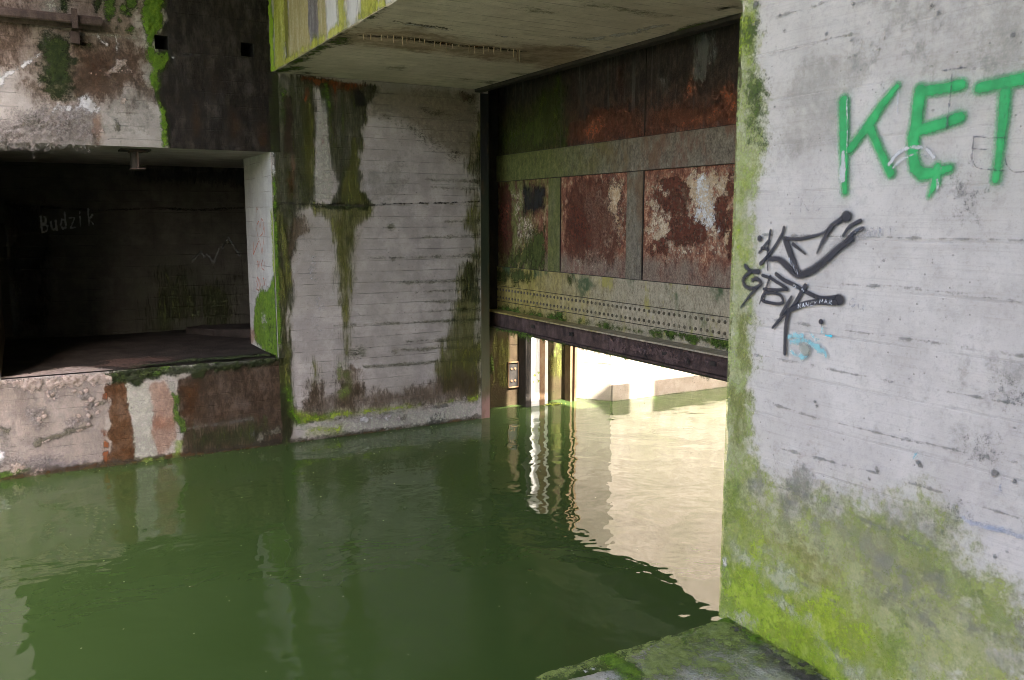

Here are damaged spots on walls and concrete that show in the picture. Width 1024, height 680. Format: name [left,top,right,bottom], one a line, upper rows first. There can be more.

water stain [43,95,101,114]
corrosion [645,68,739,135]
water stain [314,100,333,200]
corrosion [498,183,514,264]
corrosion [563,176,626,265]
corrosion [647,168,736,266]
corrosion [101,382,136,464]
water stain [0,360,480,480]
water stain [722,533,837,626]